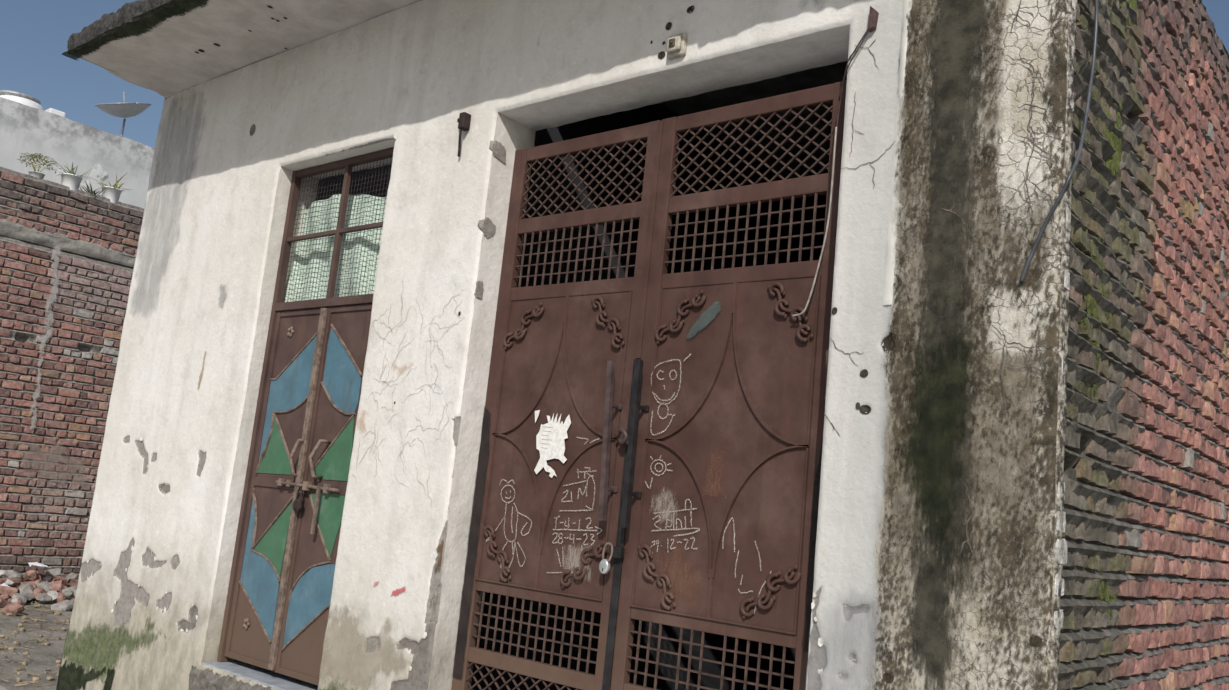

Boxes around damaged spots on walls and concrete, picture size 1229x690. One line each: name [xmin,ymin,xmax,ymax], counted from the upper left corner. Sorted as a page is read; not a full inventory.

crack [1006,0,1059,231]
peeling [123,435,157,474]
peeling [197,450,206,476]
crack [353,272,464,503]
spalling [451,414,461,447]
leakage [874,0,1069,690]
peeling [81,538,180,626]
spalling [176,605,198,632]
peeling [365,636,379,652]
spalling [390,521,448,690]